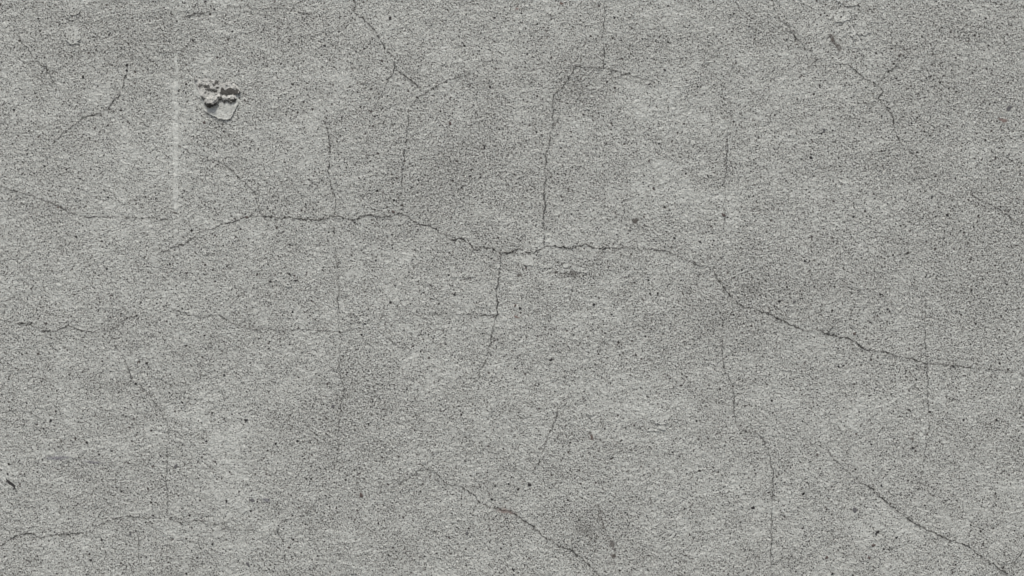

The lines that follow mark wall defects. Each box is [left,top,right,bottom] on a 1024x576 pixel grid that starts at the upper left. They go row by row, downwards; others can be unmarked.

peeling [196,85,239,124]
crack [843,60,917,157]
crack [164,0,644,374]
crack [650,248,999,557]
crack [827,448,1021,575]